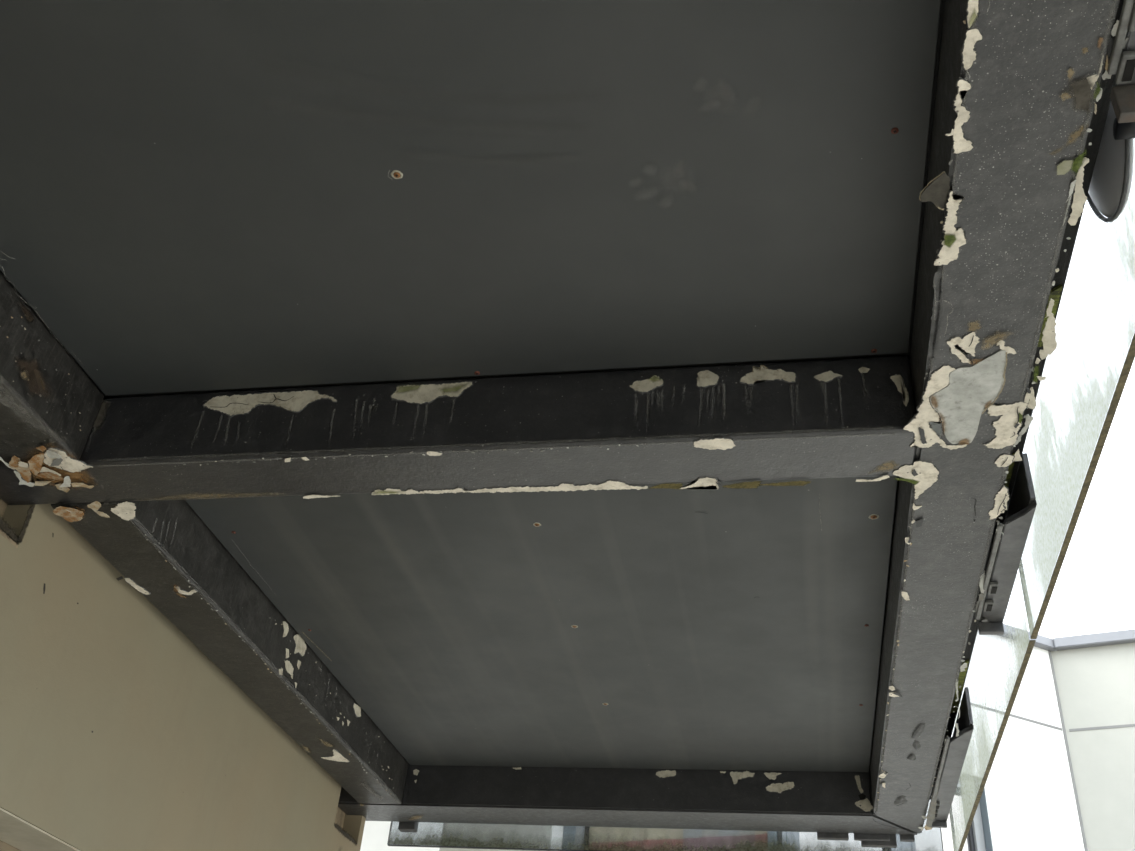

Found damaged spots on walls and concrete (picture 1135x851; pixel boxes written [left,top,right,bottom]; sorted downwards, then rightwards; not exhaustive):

peeling [1063,128,1092,252]
peeling [856,0,1059,545]
peeling [390,381,473,405]
peeling [630,375,664,394]
peeling [696,370,720,388]
peeling [739,365,797,385]
peeling [693,437,736,450]
spalling [0,446,136,522]
peeling [371,479,648,495]
peeling [679,476,723,489]
peeling [256,617,394,798]
peeling [720,771,795,794]